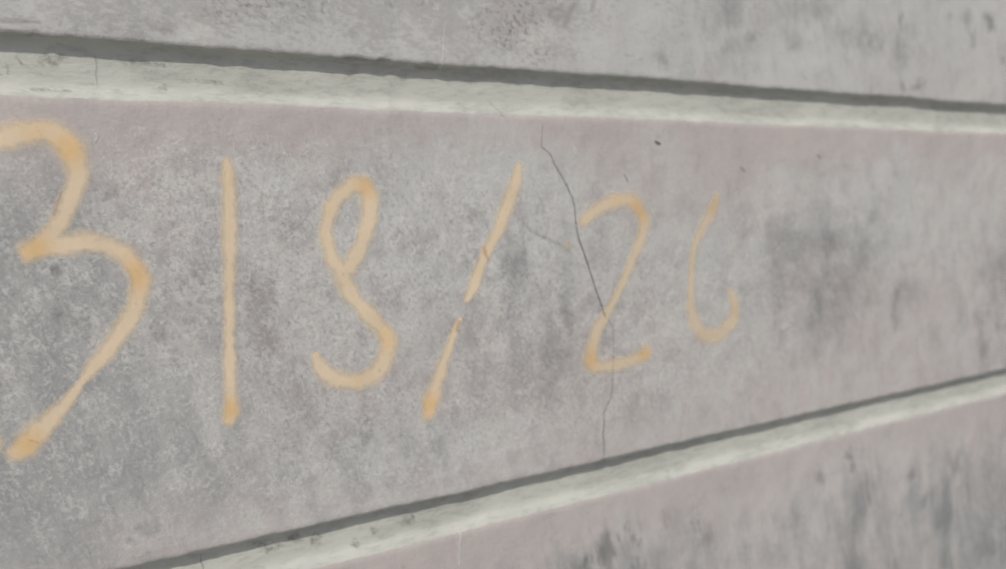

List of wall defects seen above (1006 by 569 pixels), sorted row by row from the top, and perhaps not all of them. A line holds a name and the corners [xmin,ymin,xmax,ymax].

crack [541,137,612,325]